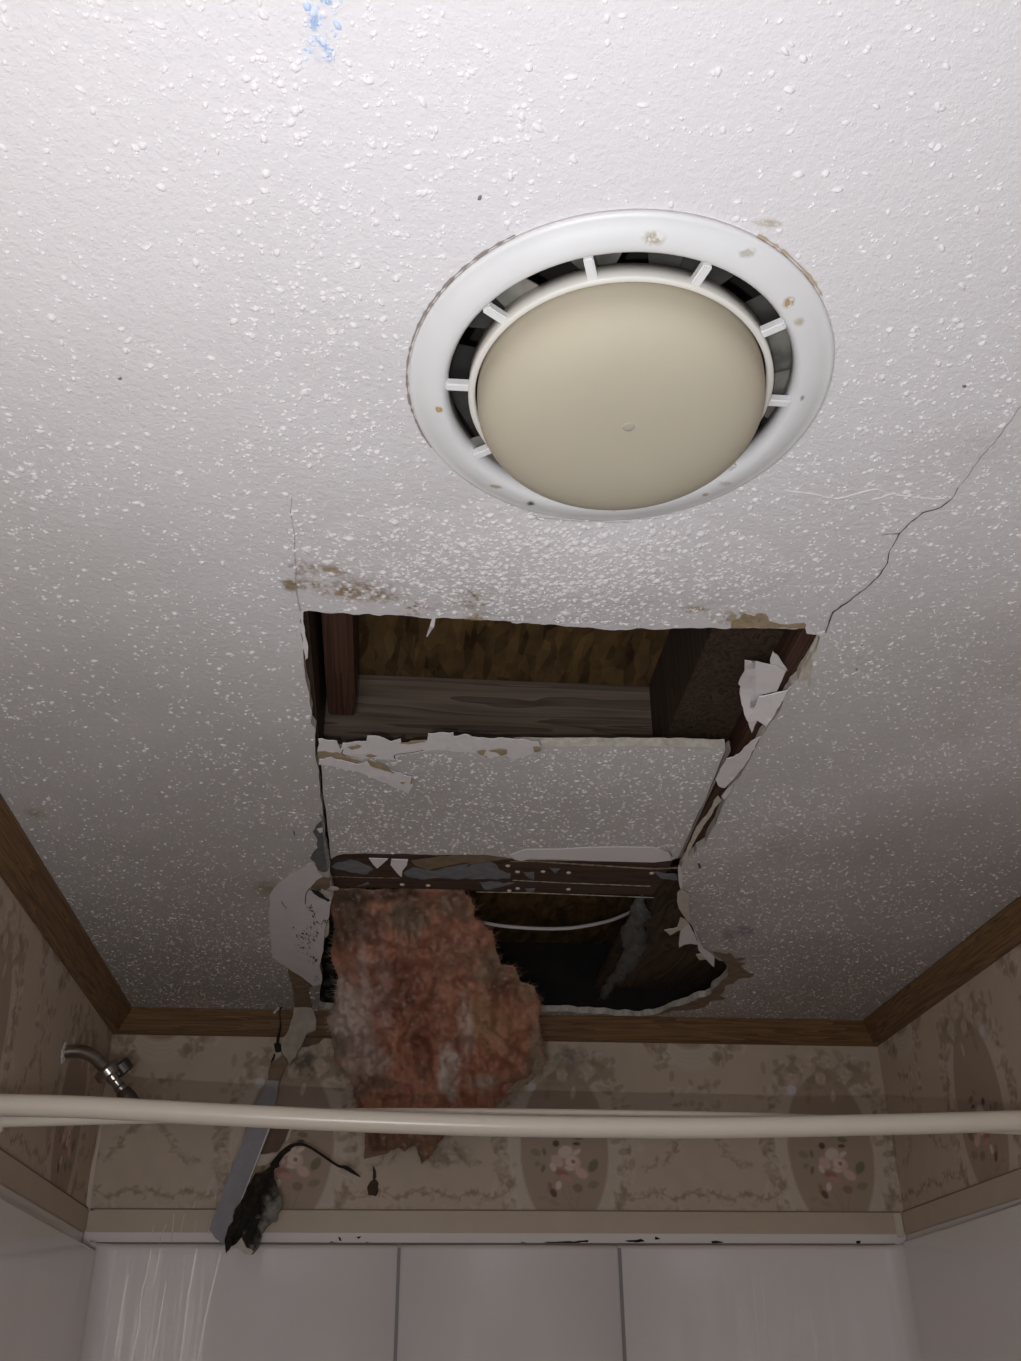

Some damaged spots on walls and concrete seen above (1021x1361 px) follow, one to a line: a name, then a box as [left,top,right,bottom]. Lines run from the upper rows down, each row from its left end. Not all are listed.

water stain [335,584,390,600]
crack [825,406,1021,633]
peeling [269,813,339,992]